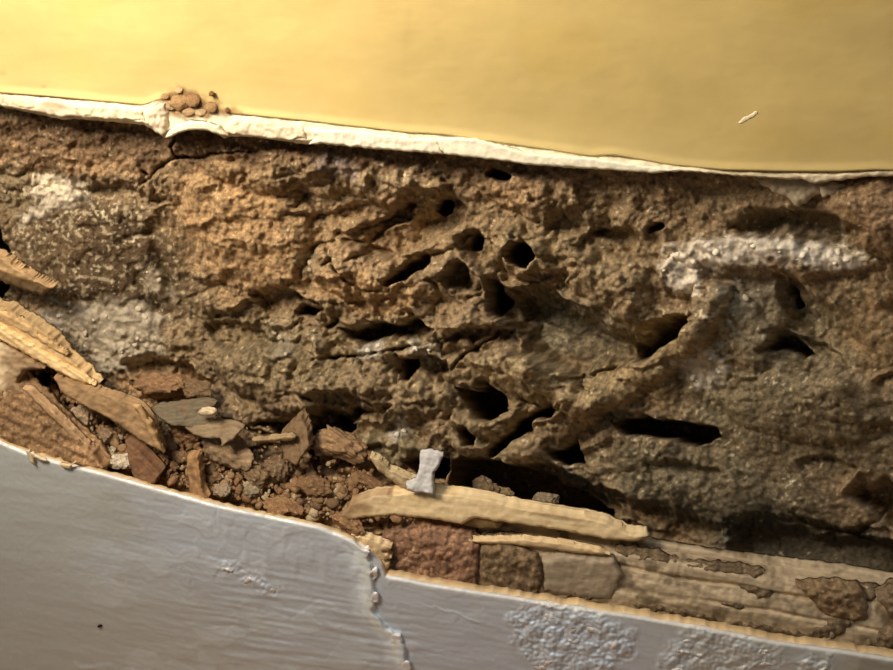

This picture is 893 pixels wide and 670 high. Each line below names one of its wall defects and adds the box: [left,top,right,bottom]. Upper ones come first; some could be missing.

crack [136,136,253,189]
spalling [0,93,893,207]
peeling [26,448,47,465]
peeling [655,626,834,670]